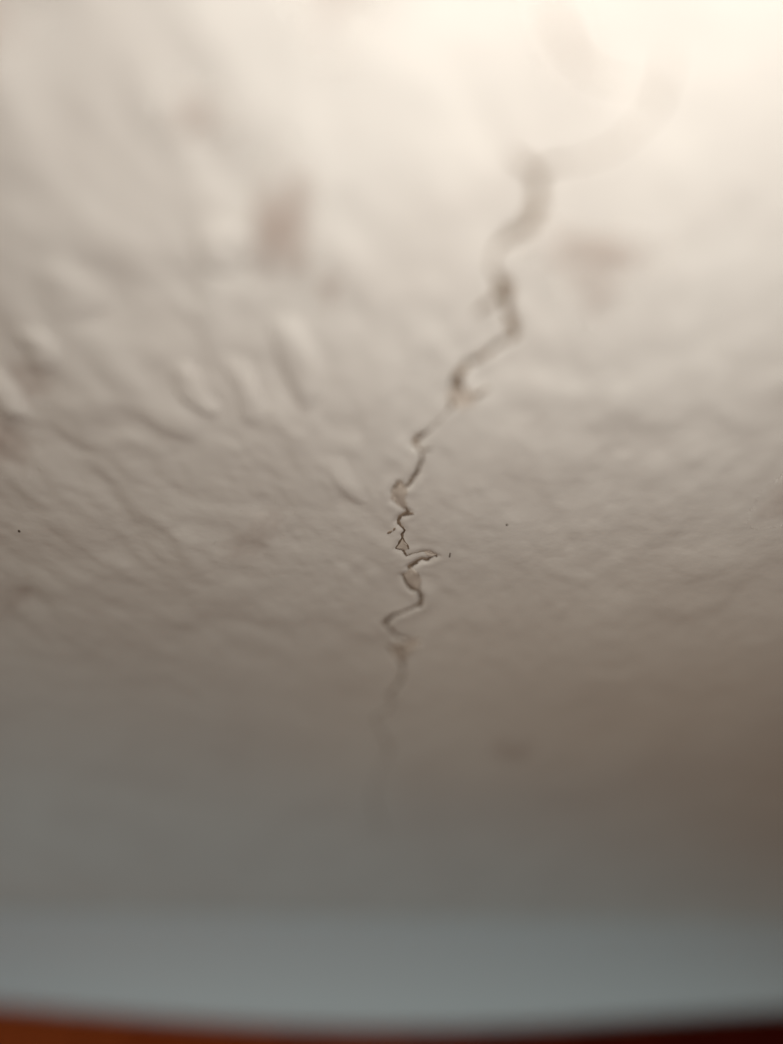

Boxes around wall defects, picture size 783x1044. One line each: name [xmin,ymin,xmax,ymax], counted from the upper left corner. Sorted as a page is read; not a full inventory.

crack [372,0,670,834]